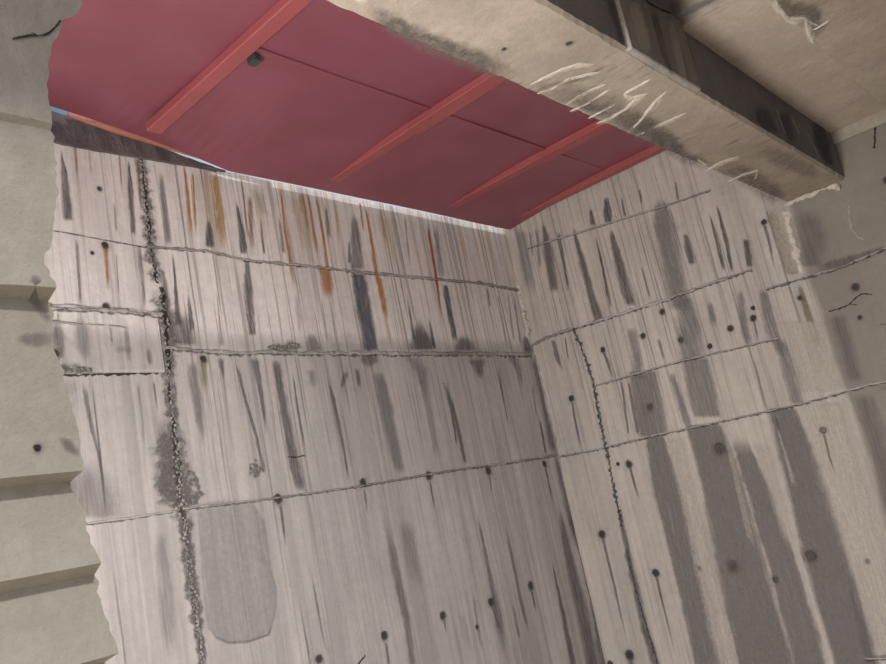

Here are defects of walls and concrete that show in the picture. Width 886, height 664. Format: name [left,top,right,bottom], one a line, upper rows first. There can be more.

crack [13,20,61,40]
corrosion [184,170,196,225]
corrosion [210,178,224,234]
corrosion [303,197,331,292]
corrosion [360,205,386,311]
corrosion [428,229,440,304]
crack [573,328,623,526]
crack [627,550,658,664]